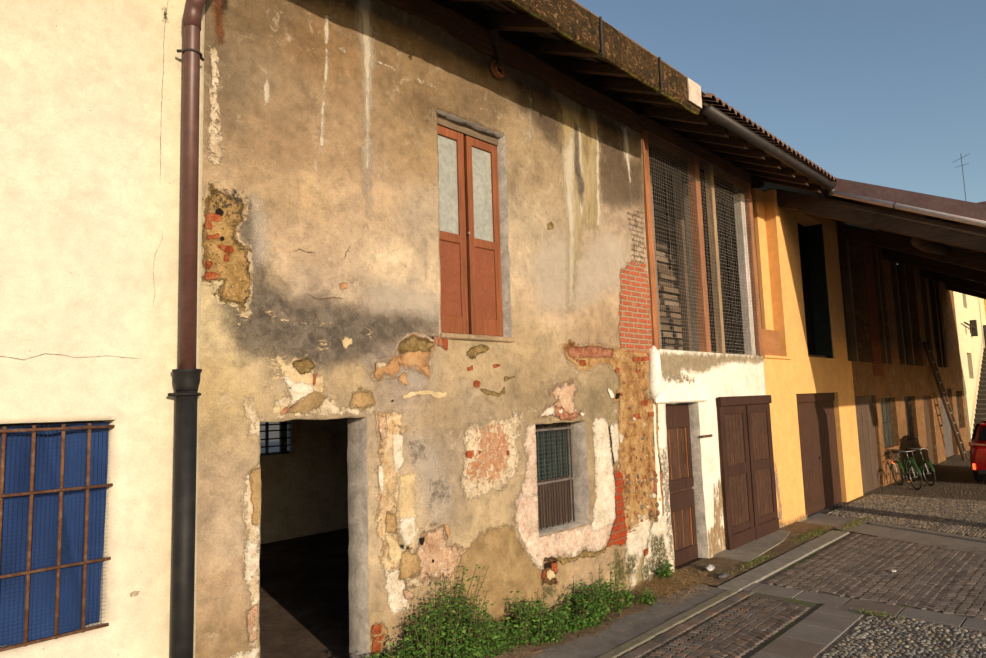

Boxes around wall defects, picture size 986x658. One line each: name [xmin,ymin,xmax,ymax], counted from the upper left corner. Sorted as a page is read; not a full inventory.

flaking render [207,45,224,166]
flaking render [201,180,254,328]
flaking render [230,463,261,658]
flaking render [243,332,464,614]
leakage [339,0,374,202]
flaking render [371,621,388,657]
flaking render [460,378,624,588]
leakage [520,83,640,307]
flaking render [618,211,653,355]
flaking render [662,373,695,384]